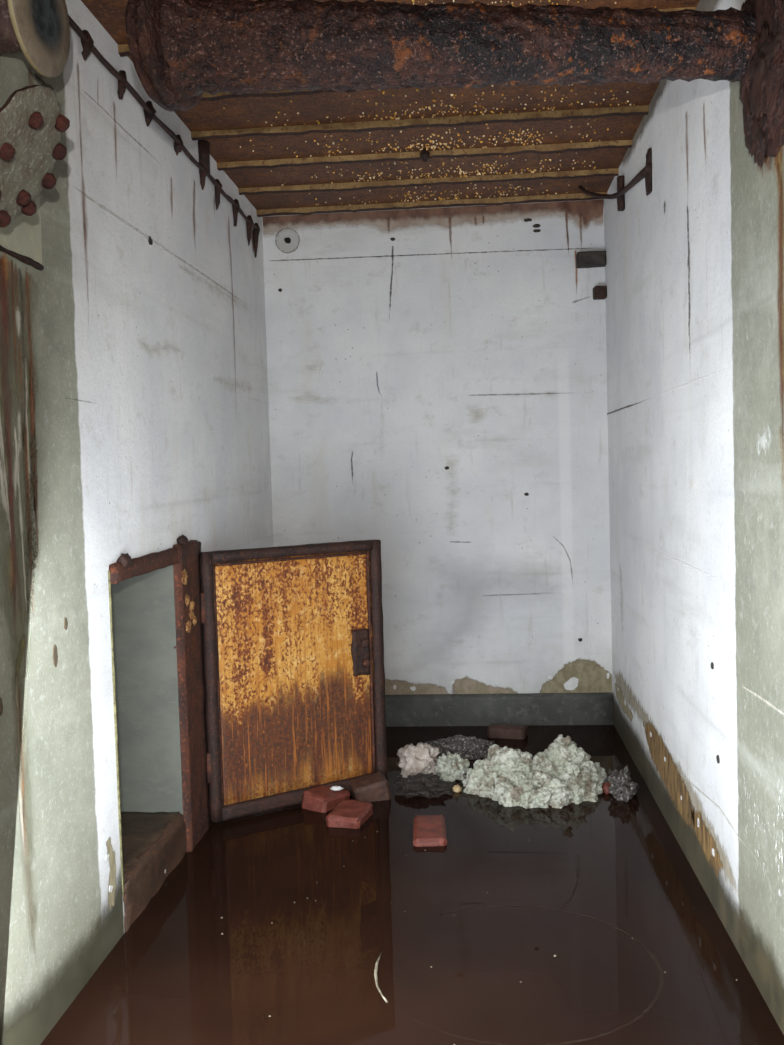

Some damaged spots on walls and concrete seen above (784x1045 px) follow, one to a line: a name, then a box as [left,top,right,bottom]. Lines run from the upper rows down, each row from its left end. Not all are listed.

corrosion [760,146,784,429]
corrosion [0,256,40,855]
peeling [385,677,517,695]
peeling [540,659,723,876]